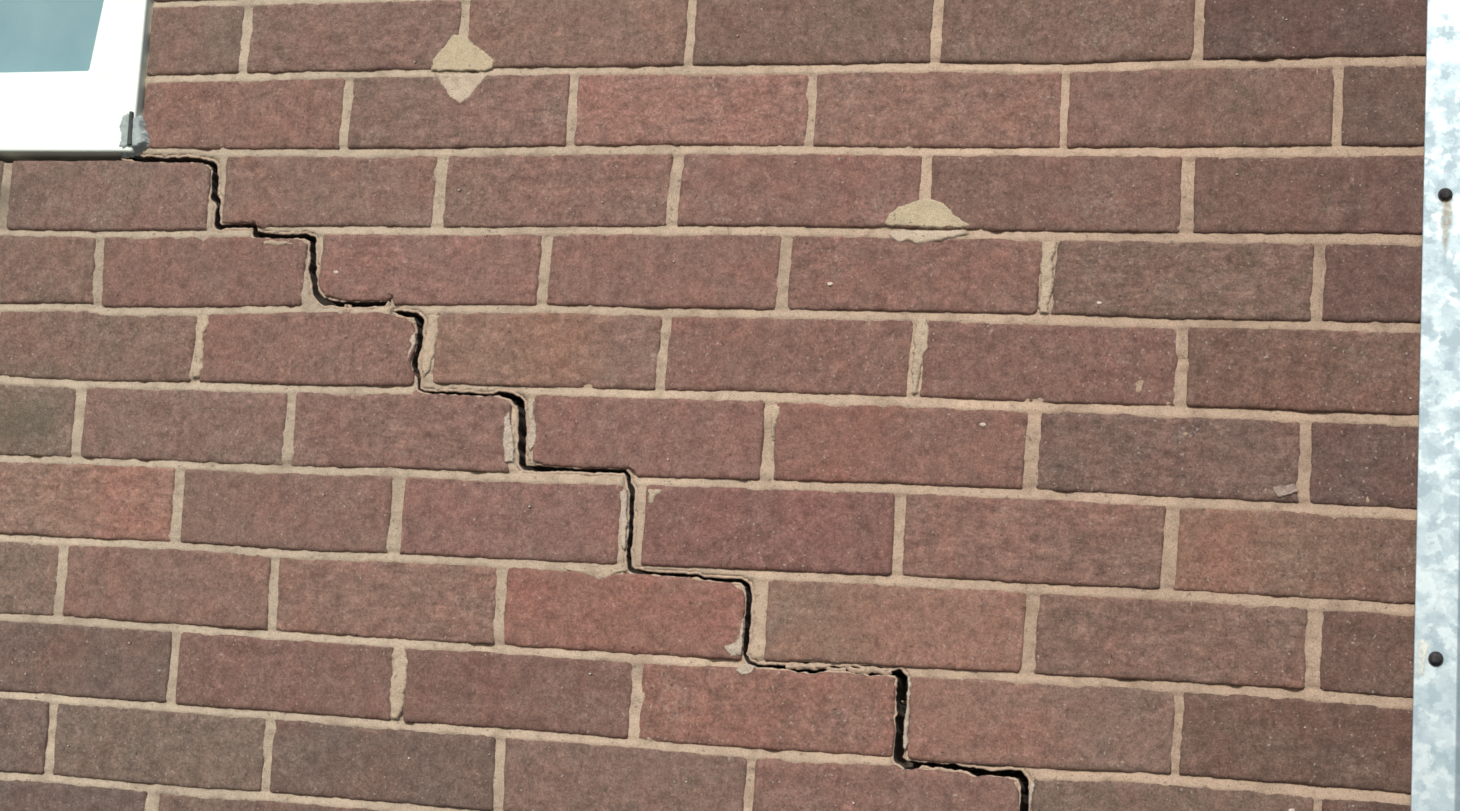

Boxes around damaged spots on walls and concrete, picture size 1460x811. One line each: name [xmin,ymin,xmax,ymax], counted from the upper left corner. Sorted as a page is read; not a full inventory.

crack [121,152,1036,811]